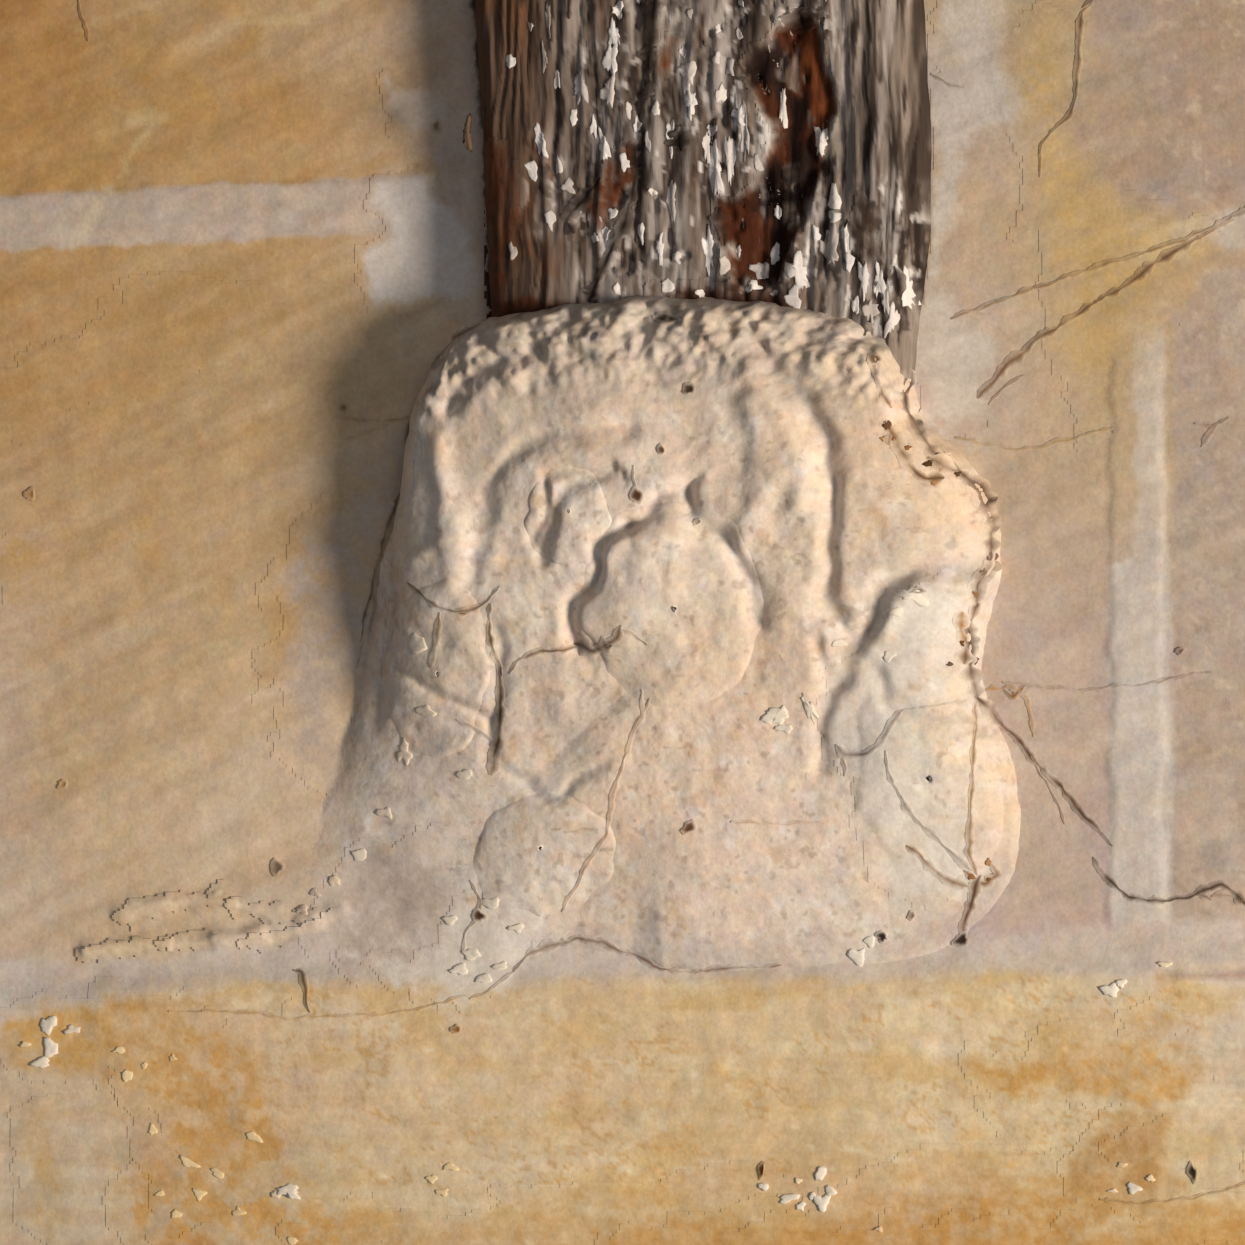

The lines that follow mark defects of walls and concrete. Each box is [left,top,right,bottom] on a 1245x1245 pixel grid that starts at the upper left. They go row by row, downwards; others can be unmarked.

peeling [524,122,576,194]
peeling [527,0,698,172]
peeling [701,51,764,195]
peeling [694,225,810,309]
peeling [779,88,788,129]
crack [887,266,907,297]
peeling [812,0,1039,443]
crack [1038,0,1094,177]
crack [951,207,1245,405]
crack [335,322,647,776]
crack [835,358,1245,935]
crack [169,690,782,1021]